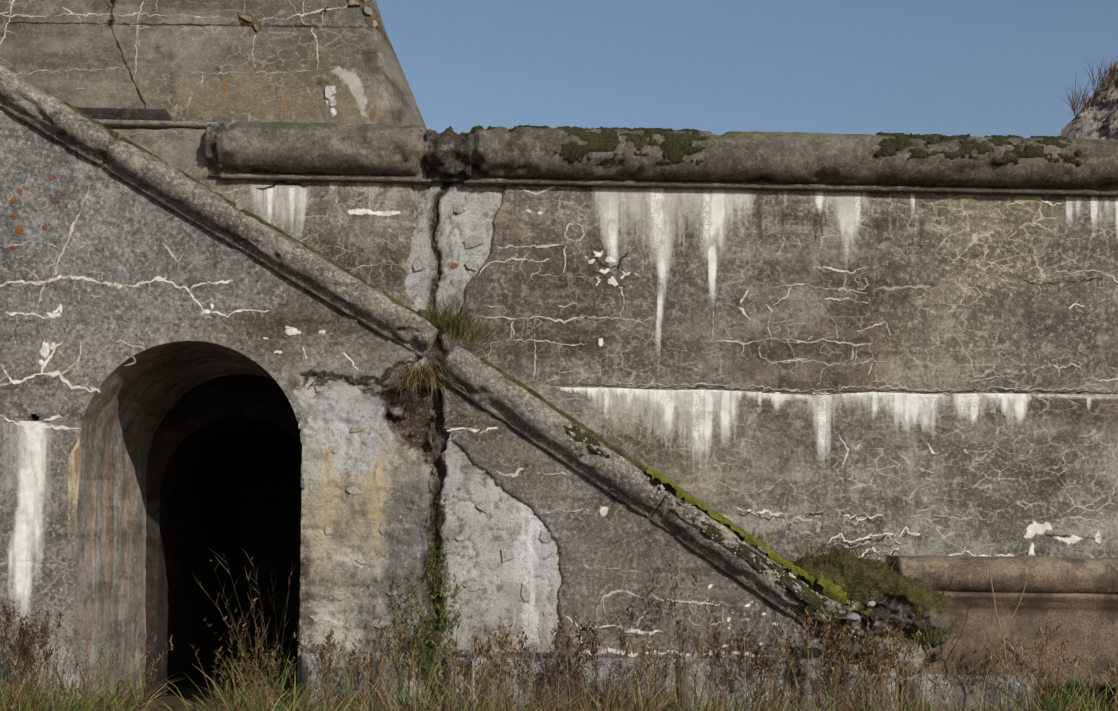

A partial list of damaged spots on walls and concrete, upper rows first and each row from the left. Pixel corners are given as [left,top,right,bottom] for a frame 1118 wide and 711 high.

crack [0,0,362,110]
rust [9,189,23,249]
efflorescence [251,185,307,224]
peeling [405,126,504,317]
crack [478,185,652,380]
water stain [585,187,882,338]
crack [712,266,950,389]
water stain [1066,196,1118,232]
crack [0,181,498,631]
efflorescence [550,382,1118,453]
efflorescence [9,421,47,614]
spalling [292,356,562,654]